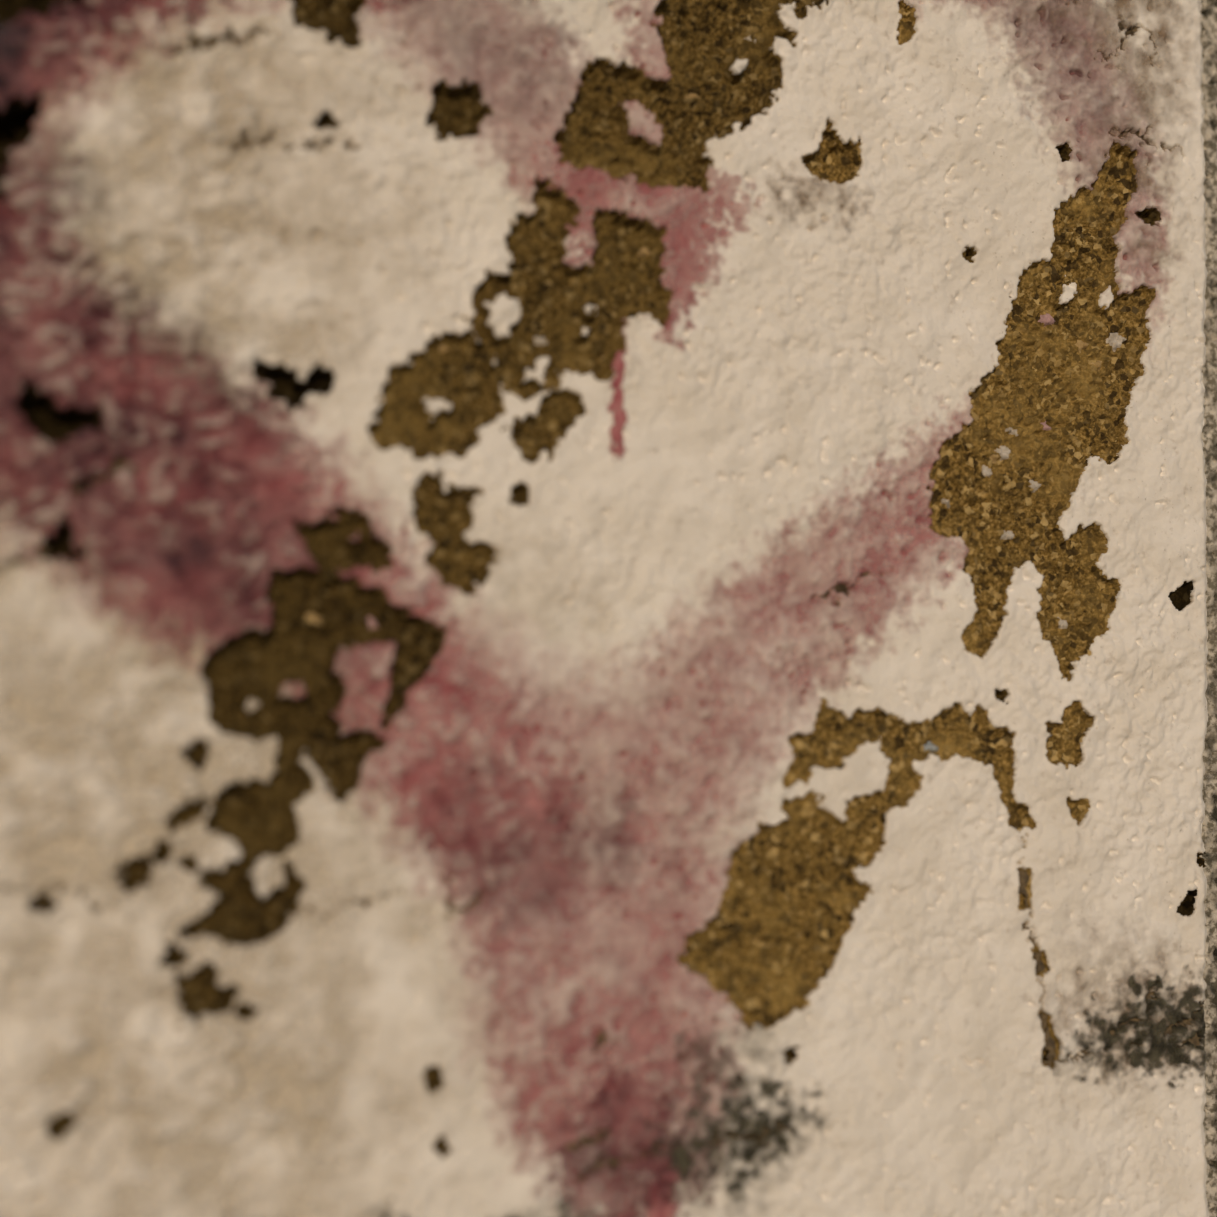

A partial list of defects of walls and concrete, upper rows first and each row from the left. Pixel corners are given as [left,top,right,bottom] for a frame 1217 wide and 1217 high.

peeling [0,92,45,203]
peeling [291,0,367,50]
spalling [426,79,493,141]
peeling [553,0,829,193]
spalling [801,120,862,184]
peeling [367,175,675,595]
peeling [926,141,1161,681]
peeling [111,508,448,1027]
peeling [677,698,1036,1030]
spalling [1045,701,1094,770]
spalling [1066,797,1091,824]
crack [1018,869,1204,1069]